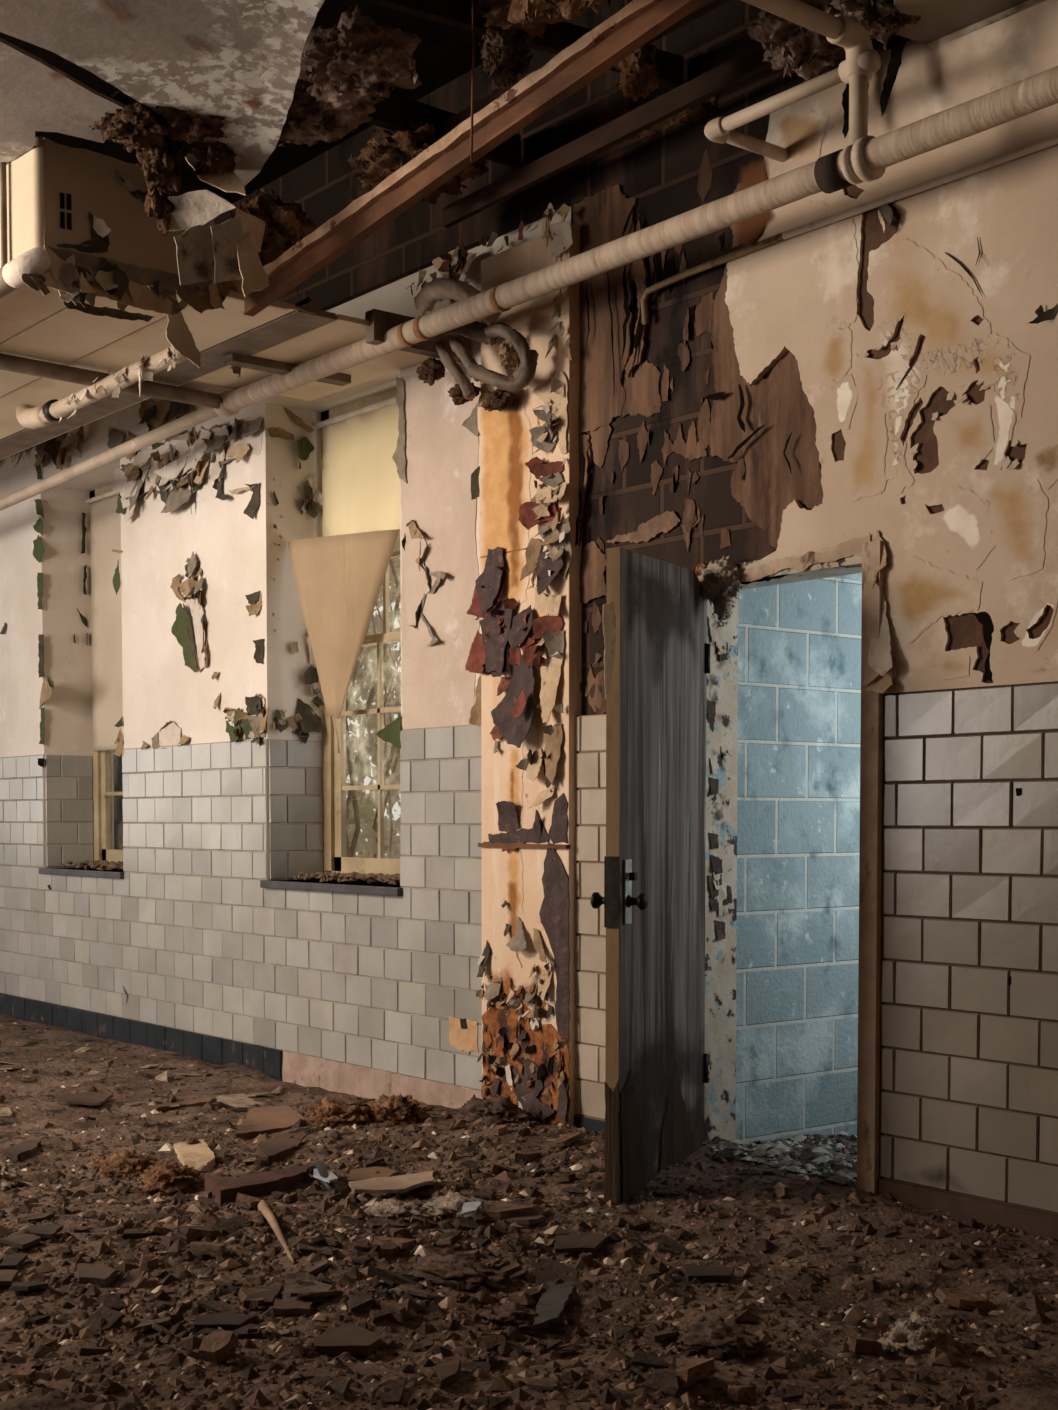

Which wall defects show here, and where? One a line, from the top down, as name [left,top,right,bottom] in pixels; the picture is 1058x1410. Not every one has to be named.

flaking render [406,114,770,295]
peeling [33,499,45,610]
peeling [38,634,54,768]
peeling [11,211,322,561]
peeling [171,551,324,747]
corrosion [477,391,533,610]
flaking render [376,223,897,852]
flaking render [903,360,991,474]
flaking render [945,605,1054,683]
peeling [476,900,554,1022]
corrosion [477,742,571,1125]
peeling [707,746,732,940]